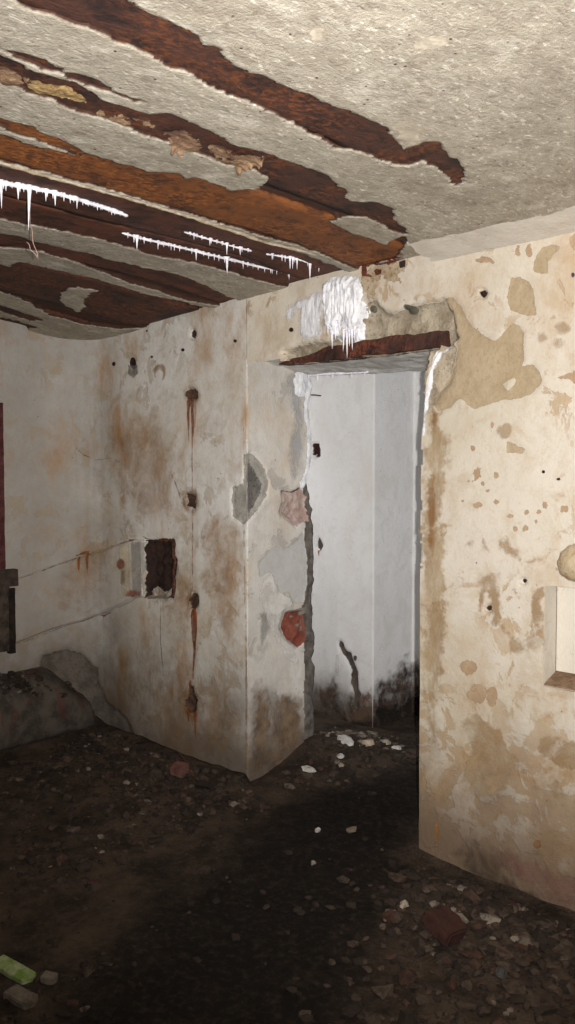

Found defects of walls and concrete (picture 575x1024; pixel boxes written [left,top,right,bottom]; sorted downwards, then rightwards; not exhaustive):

peeling [0,66,87,103]
peeling [96,110,264,176]
peeling [392,121,424,145]
damp [286,274,371,353]
peeling [284,234,575,436]
corrosion [185,389,198,435]
flaking render [232,454,268,524]
peeling [259,487,323,664]
damp [319,414,446,727]
corrosion [185,593,199,732]